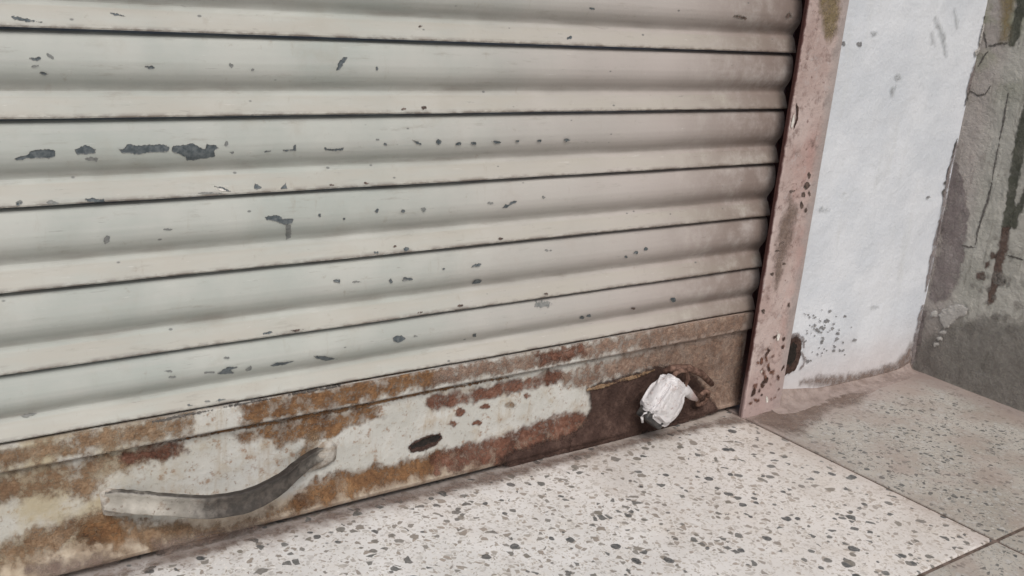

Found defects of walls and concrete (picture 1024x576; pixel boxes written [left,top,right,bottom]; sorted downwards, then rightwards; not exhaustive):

water stain [1009,0,1024,46]
peeling [15,149,55,160]
peeling [75,145,98,162]
peeling [118,141,234,161]
crack [926,16,1009,248]
water stain [1002,109,1024,230]
spalling [785,333,807,375]
corrosion [0,313,785,576]
peeling [408,433,442,453]